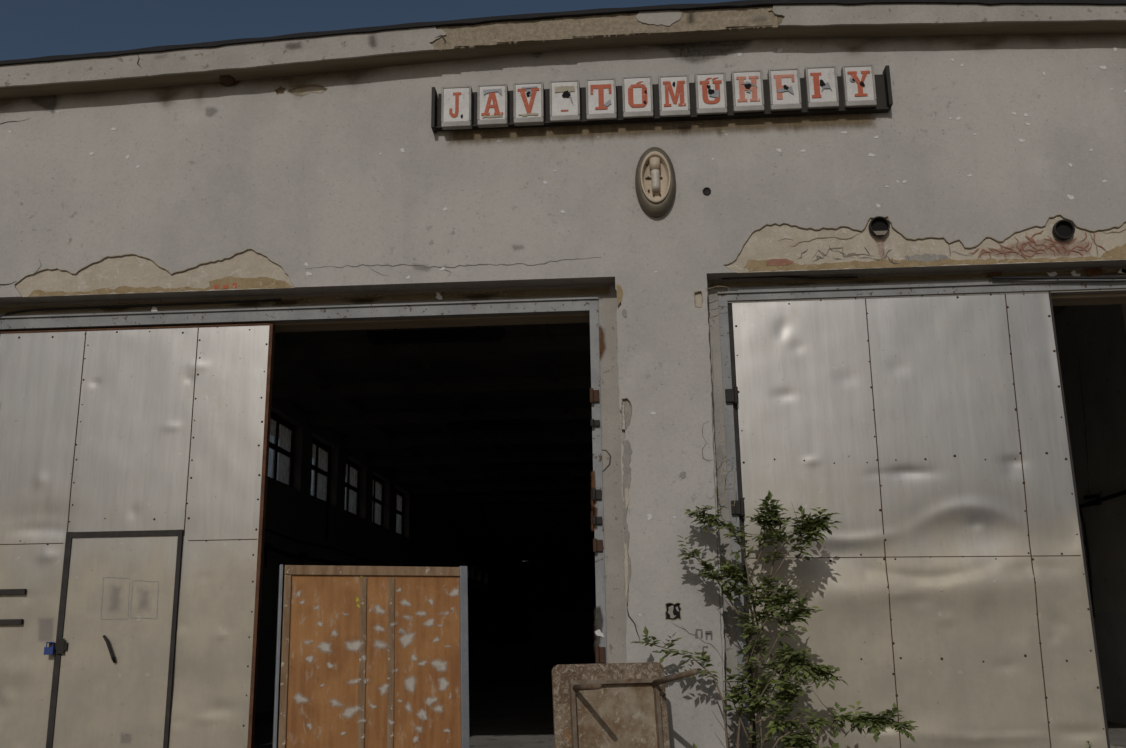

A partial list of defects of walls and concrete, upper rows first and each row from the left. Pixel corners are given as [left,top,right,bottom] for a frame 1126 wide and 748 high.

peeling [724,203,1126,276]
peeling [15,249,295,297]
crack [305,257,601,276]